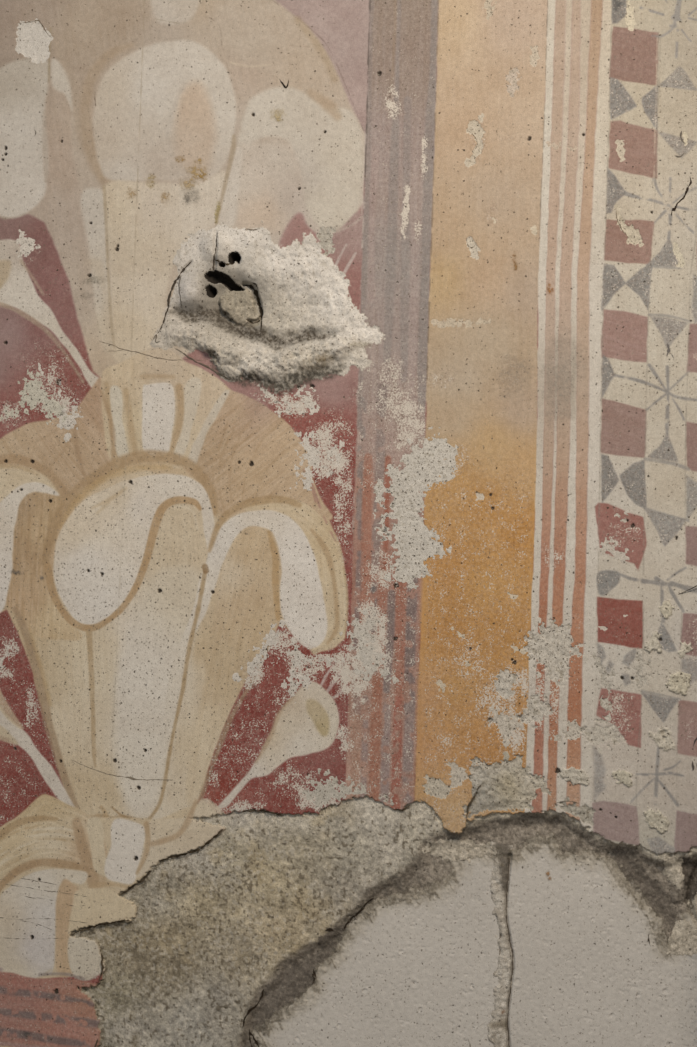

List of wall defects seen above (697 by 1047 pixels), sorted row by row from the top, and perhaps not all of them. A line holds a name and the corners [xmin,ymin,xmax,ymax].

flaking render [15,18,53,64]
peeling [0,363,83,443]
peeling [370,427,459,589]
flaking render [70,608,697,1047]